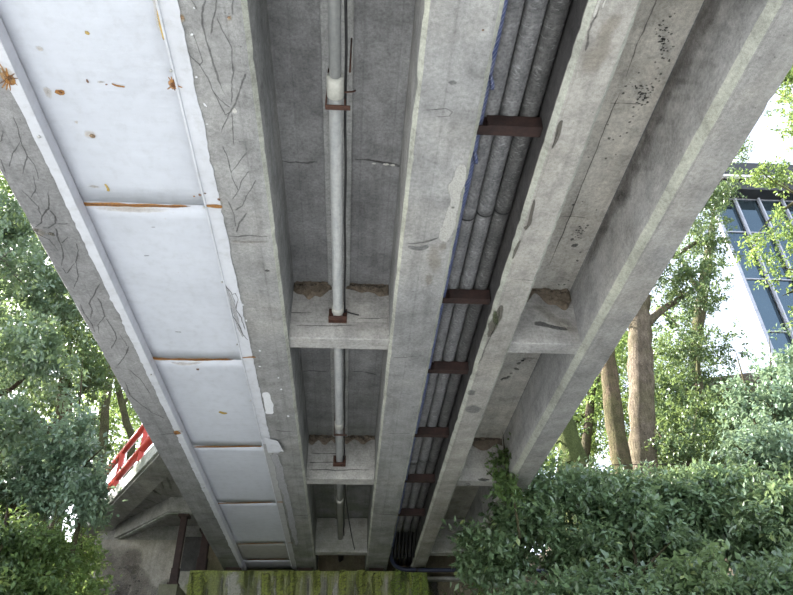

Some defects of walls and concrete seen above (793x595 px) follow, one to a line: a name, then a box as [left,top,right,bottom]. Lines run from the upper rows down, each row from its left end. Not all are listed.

rust [0,64,18,91]
leakage [608,13,676,140]
crack [191,0,267,237]
crack [0,125,79,286]
spalling [294,281,332,300]
spalling [346,283,389,297]
spalling [527,288,571,310]
spalling [309,435,335,445]
spalling [345,435,375,444]
spalling [472,437,503,451]
leakage [227,572,244,595]